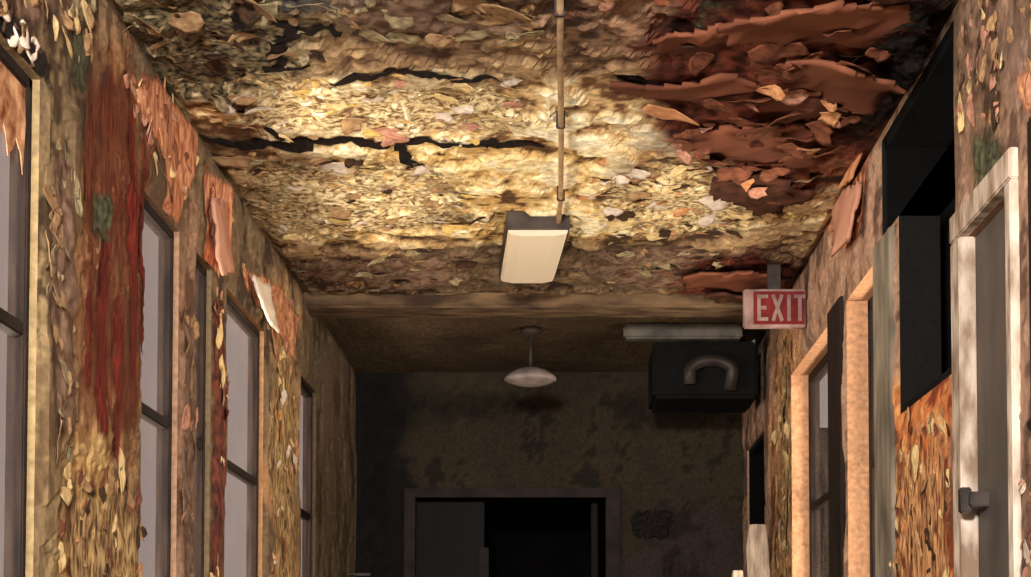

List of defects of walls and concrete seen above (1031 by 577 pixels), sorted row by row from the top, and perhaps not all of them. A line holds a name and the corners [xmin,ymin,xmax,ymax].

peeling [0,0,97,89]
peeling [43,137,147,577]
peeling [119,0,546,577]
crack [198,127,545,167]
peeling [598,0,623,13]
spalling [826,152,870,257]
peeling [888,198,955,577]
spalling [885,0,1031,231]